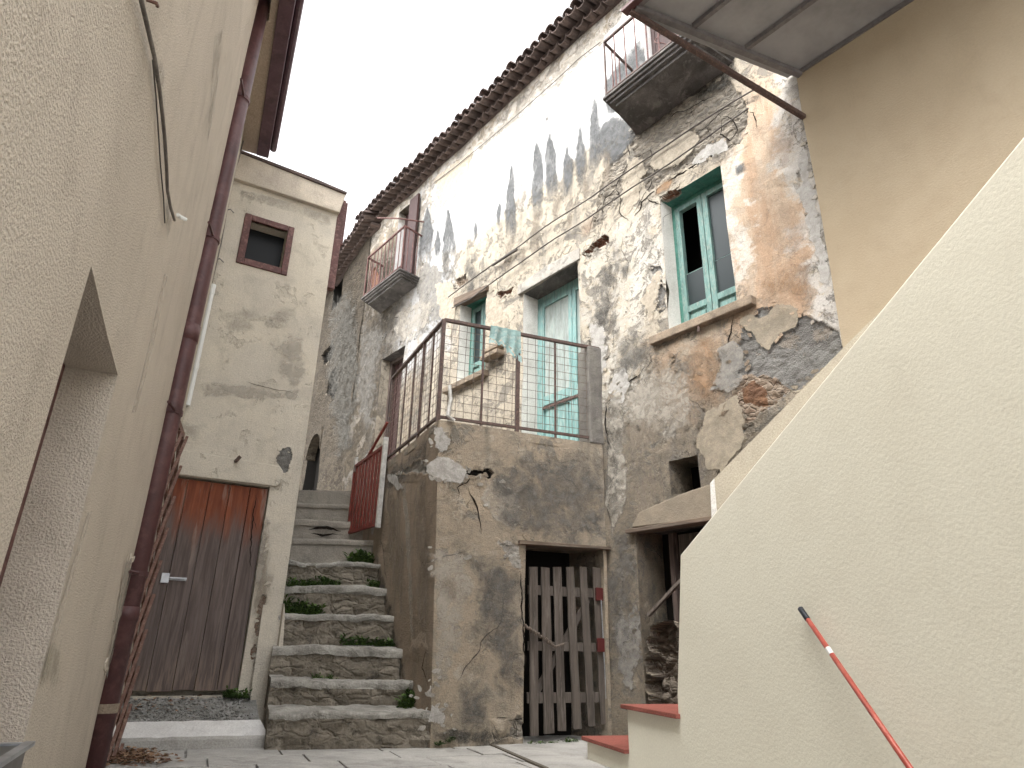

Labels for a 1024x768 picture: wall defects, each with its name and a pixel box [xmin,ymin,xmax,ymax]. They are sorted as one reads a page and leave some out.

damp [419,207,456,279]
damp [465,259,477,292]
damp [496,41,645,270]
spalling [579,73,756,263]
peeling [796,128,831,284]
spalling [587,298,843,472]
spalling [268,441,298,481]
spalling [395,427,529,579]
crack [457,471,481,527]
crack [457,572,526,682]
spalling [484,707,523,746]